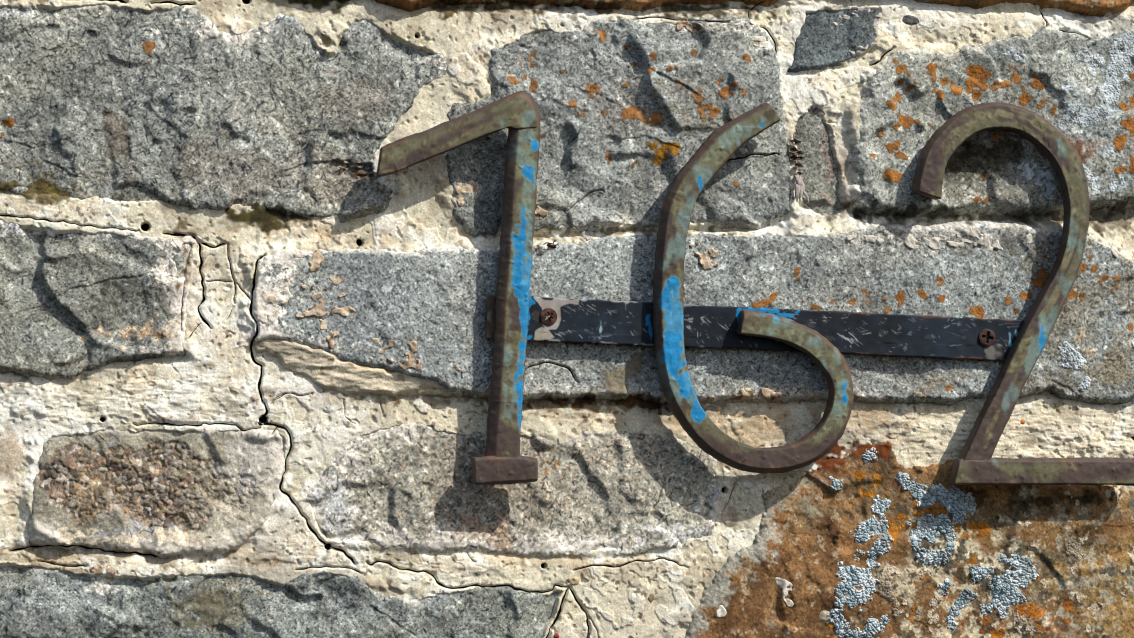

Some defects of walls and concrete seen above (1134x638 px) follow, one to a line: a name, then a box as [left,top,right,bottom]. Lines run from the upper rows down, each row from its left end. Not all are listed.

crack [154,0,201,8]
crack [0,215,686,638]